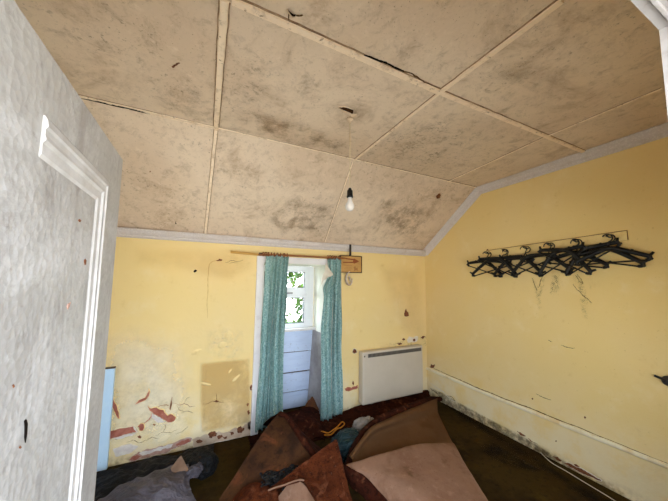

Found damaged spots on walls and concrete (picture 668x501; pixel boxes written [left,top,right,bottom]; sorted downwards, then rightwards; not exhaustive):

crack [364,54,432,86]
crack [81,98,147,114]
flaking render [110,388,251,462]
leakage [436,392,551,463]